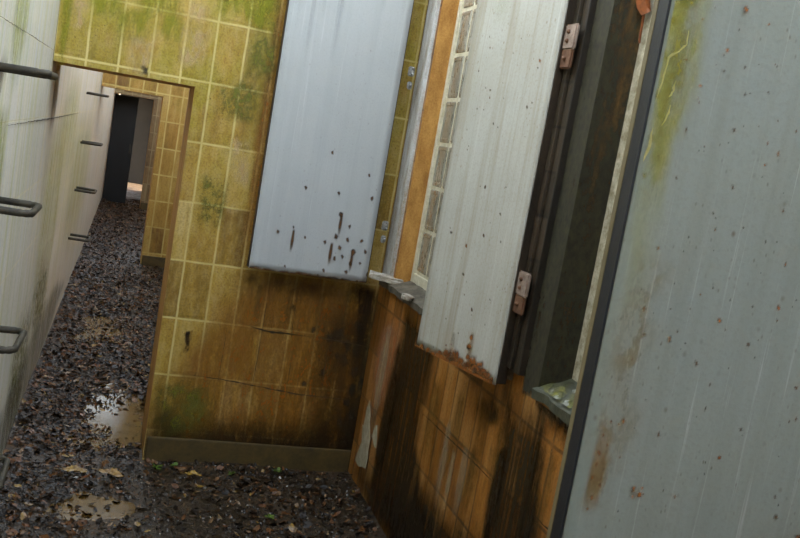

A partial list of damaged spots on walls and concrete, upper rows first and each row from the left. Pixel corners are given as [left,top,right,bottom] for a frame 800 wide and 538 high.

crack [6,113,77,126]
corrosion [249,212,368,283]
damp [484,0,645,538]
corrosion [414,335,493,384]
damp [162,284,463,538]
peeling [355,400,377,469]